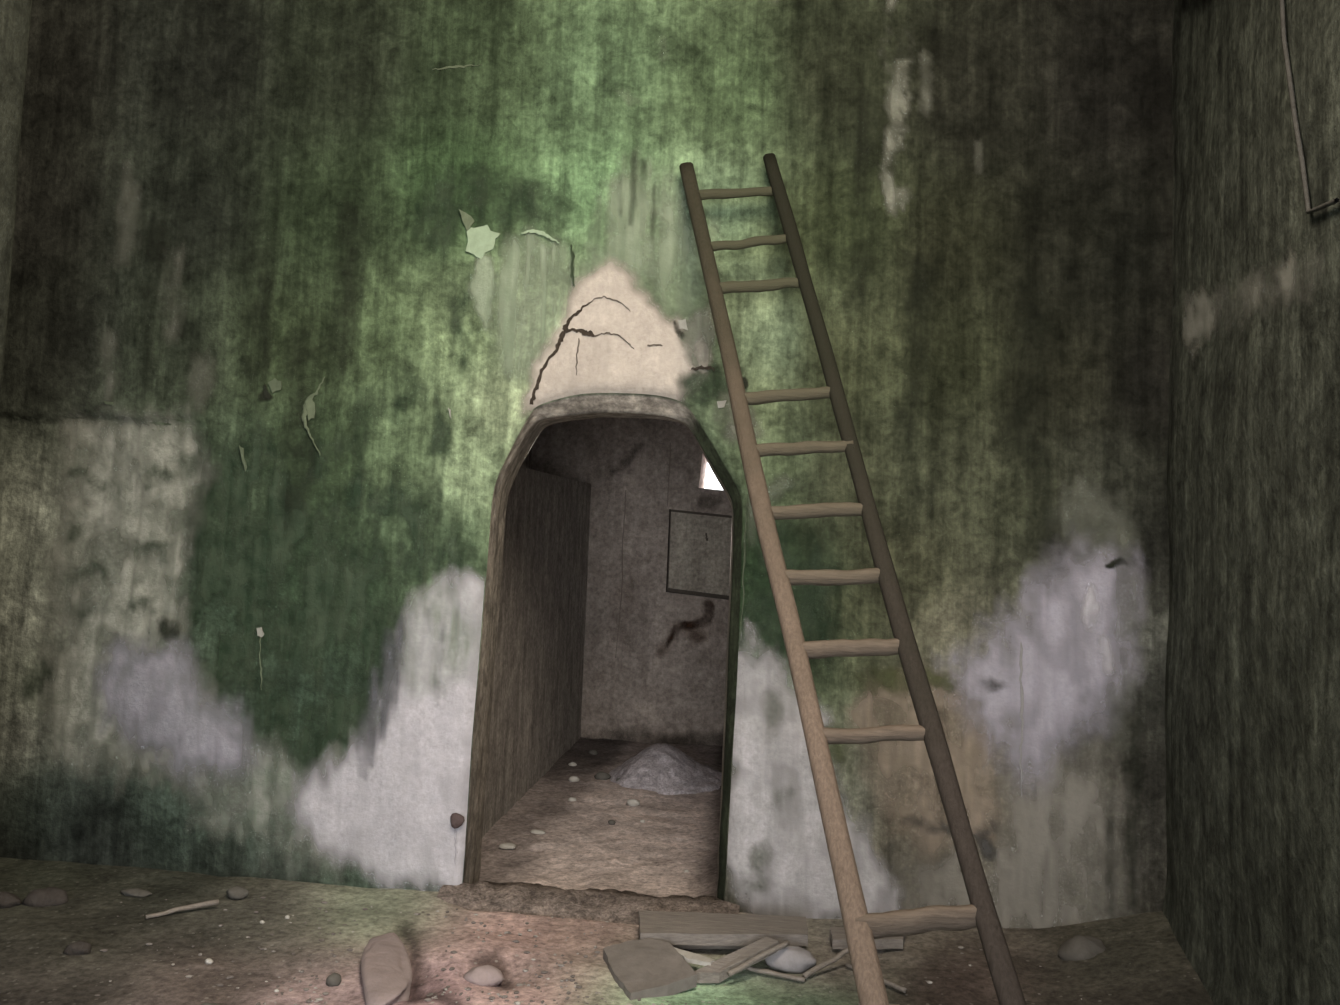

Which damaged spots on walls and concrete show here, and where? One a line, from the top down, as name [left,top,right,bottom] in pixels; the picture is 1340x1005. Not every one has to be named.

flaking render [459,209,716,411]
crack [530,244,663,405]
water stain [371,624,402,747]